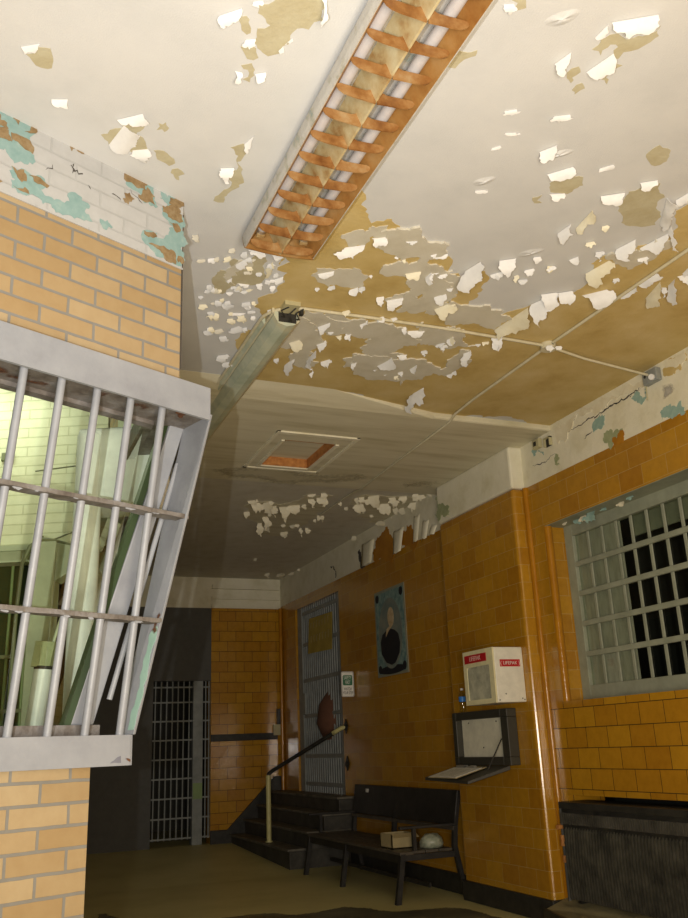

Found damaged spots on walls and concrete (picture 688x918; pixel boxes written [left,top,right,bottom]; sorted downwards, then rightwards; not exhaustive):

peeling [21,43,53,69]
peeling [217,0,328,84]
peeling [554,15,660,94]
peeling [0,111,113,230]
peeling [101,114,184,180]
peeling [532,145,583,203]
peeling [646,145,671,166]
peeling [123,173,199,266]
peeling [196,180,688,426]
crack [569,388,639,439]
peeling [592,415,625,450]
peeling [242,493,449,566]